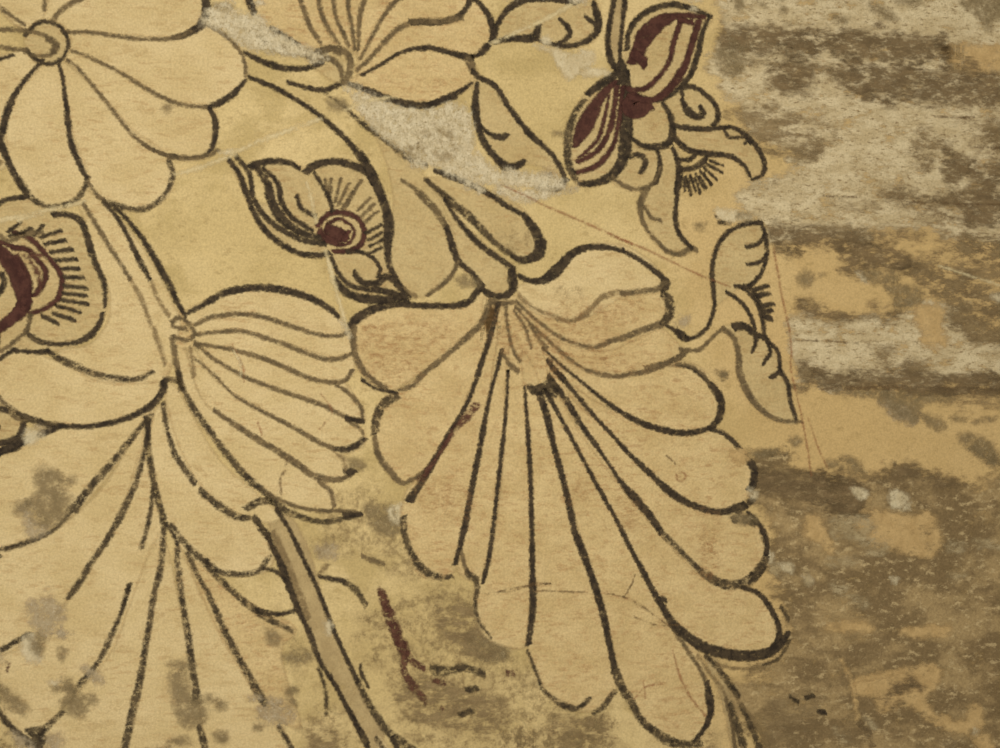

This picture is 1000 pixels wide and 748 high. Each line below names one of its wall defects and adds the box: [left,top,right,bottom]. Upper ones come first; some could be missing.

flaking render [201,0,329,63]
flaking render [539,37,608,79]
flaking render [329,87,564,203]
peeling [704,0,1000,243]
peeling [785,299,1000,394]
leakage [730,448,870,519]
leakage [892,463,956,487]
leakage [358,503,403,546]
flaking render [727,449,1000,748]
leakage [0,685,27,713]
leakage [4,727,63,748]